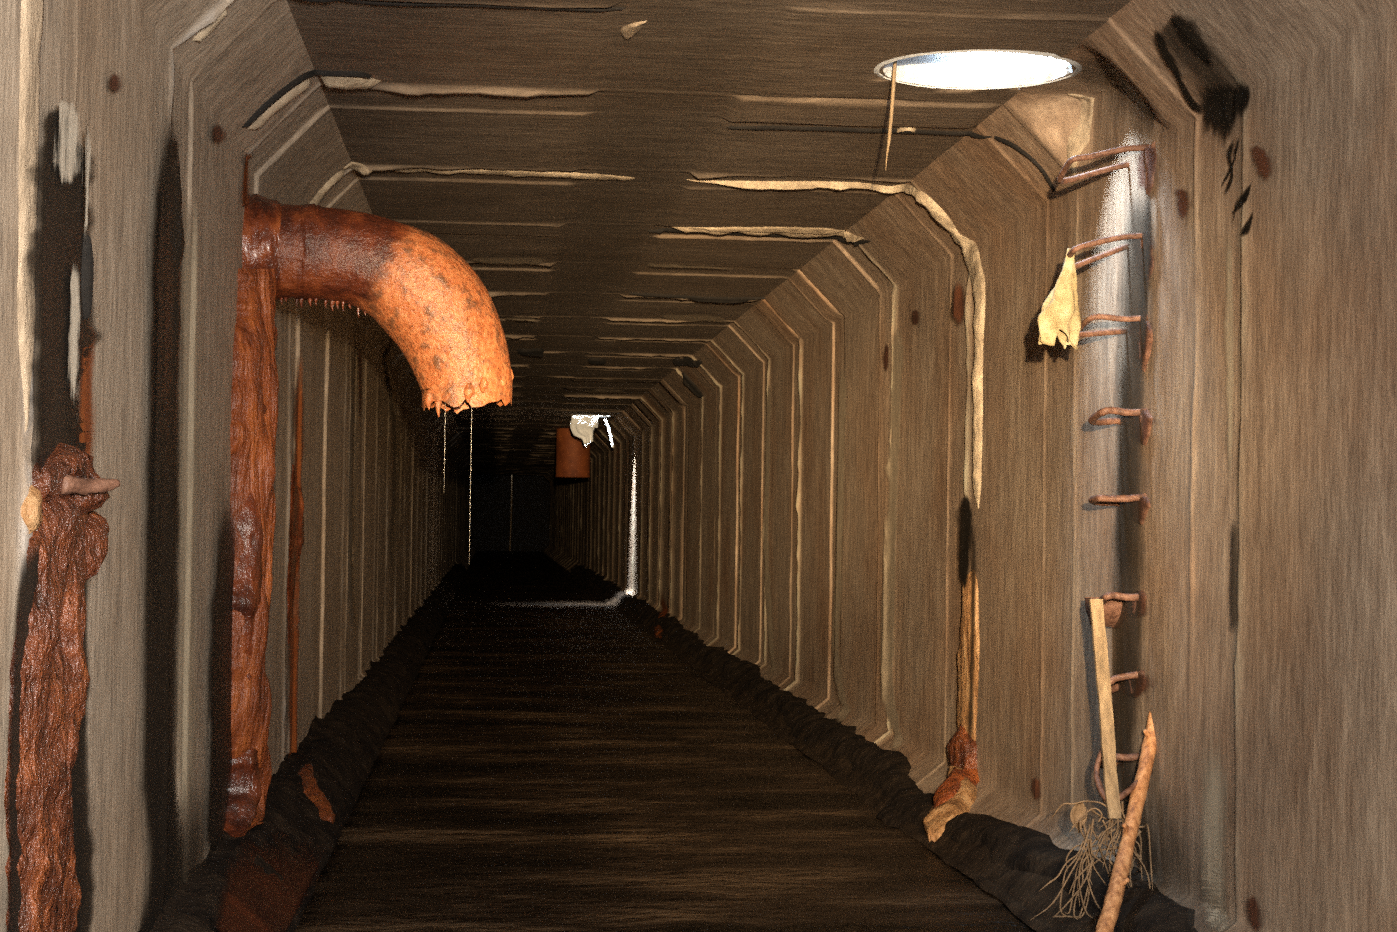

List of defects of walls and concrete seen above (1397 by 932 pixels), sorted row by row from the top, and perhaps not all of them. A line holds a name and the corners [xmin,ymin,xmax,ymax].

leakage [1155,14,1250,140]
rust [1138,141,1157,195]
rust [1176,189,1188,217]
rust [1139,319,1153,372]
rust [224,268,366,837]
rust [4,336,110,932]
rust [1084,590,1147,628]
rust [923,540,980,842]
rust [1129,670,1148,698]